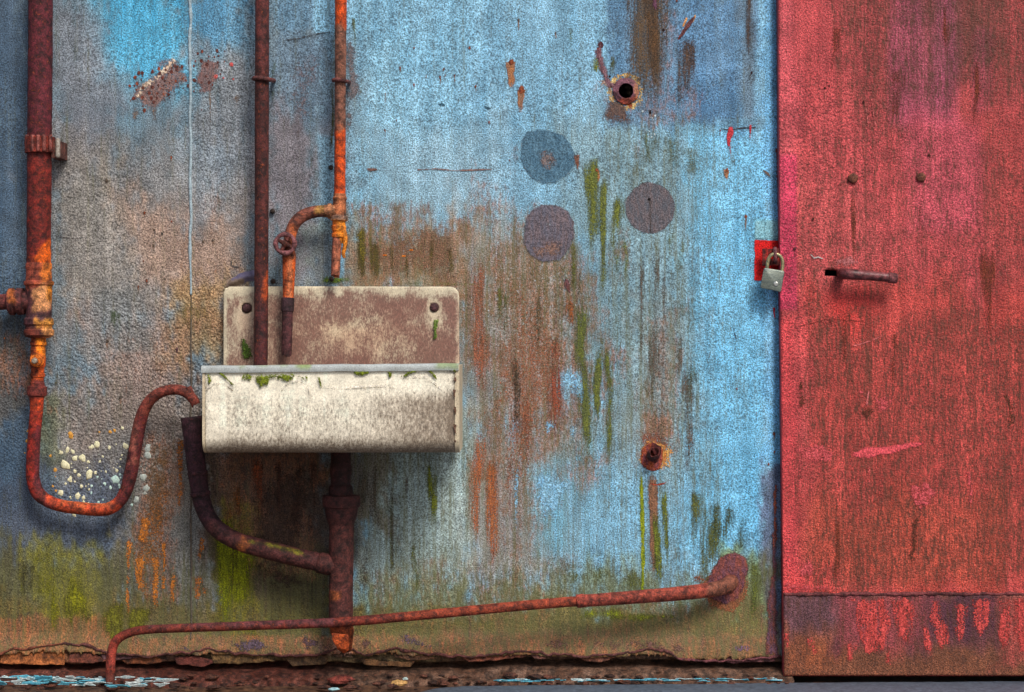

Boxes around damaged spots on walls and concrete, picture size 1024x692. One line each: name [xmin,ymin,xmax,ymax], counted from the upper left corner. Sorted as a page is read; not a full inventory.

peeling [129,49,234,122]
rust [595,0,696,124]
rust [746,0,754,51]
rust [357,229,454,280]
rust [469,254,575,559]
rust [125,438,184,612]
rust [227,460,316,548]
rust [0,485,781,667]
rust [639,431,676,573]
peeling [302,633,349,654]